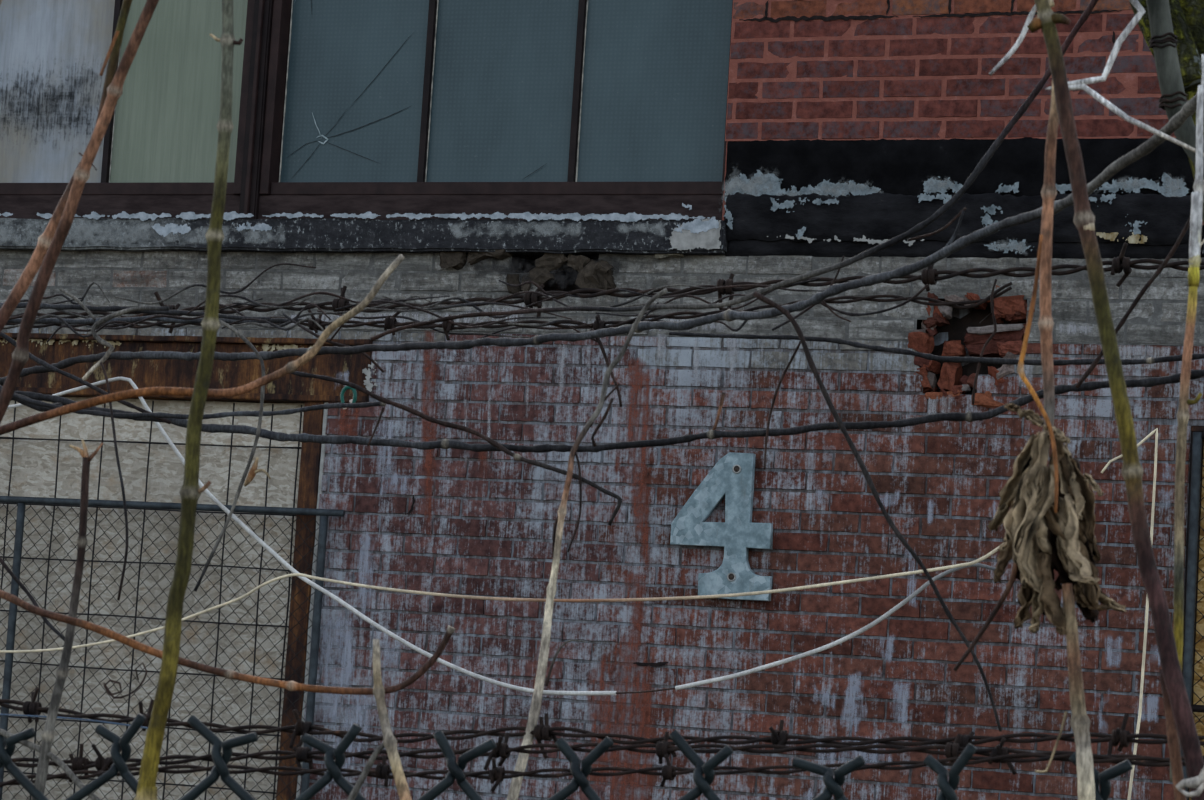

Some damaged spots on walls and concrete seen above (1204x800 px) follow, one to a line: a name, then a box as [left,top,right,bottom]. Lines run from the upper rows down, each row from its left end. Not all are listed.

crack [739,0,1121,44]
peeling [917,176,963,204]
peeling [1055,183,1072,194]
peeling [1088,173,1189,207]
spalling [67,170,888,296]
peeling [981,182,1034,254]
peeling [1096,214,1148,244]
spalling [907,285,1035,408]
peeling [362,361,378,392]